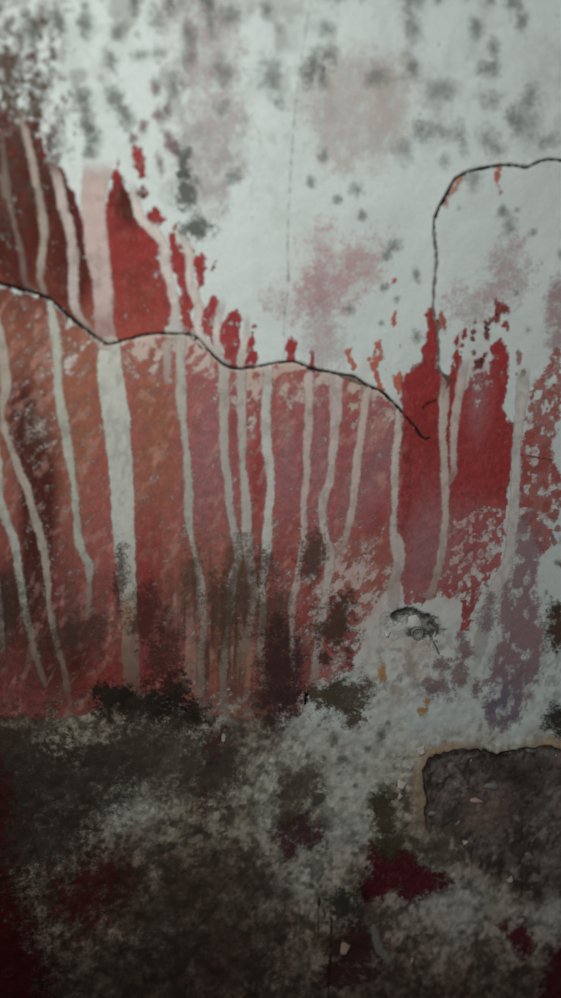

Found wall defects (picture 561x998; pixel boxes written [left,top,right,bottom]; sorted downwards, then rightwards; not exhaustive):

damp [0,5,376,895]
peeling [132,145,258,368]
crack [0,158,561,440]
peeling [285,335,298,361]
peeling [368,340,403,394]
damp [388,408,406,594]
spalling [391,608,445,653]
damp [421,368,561,737]
damp [547,282,561,348]
damp [366,788,406,861]
spalling [397,737,561,904]
damp [309,881,388,990]